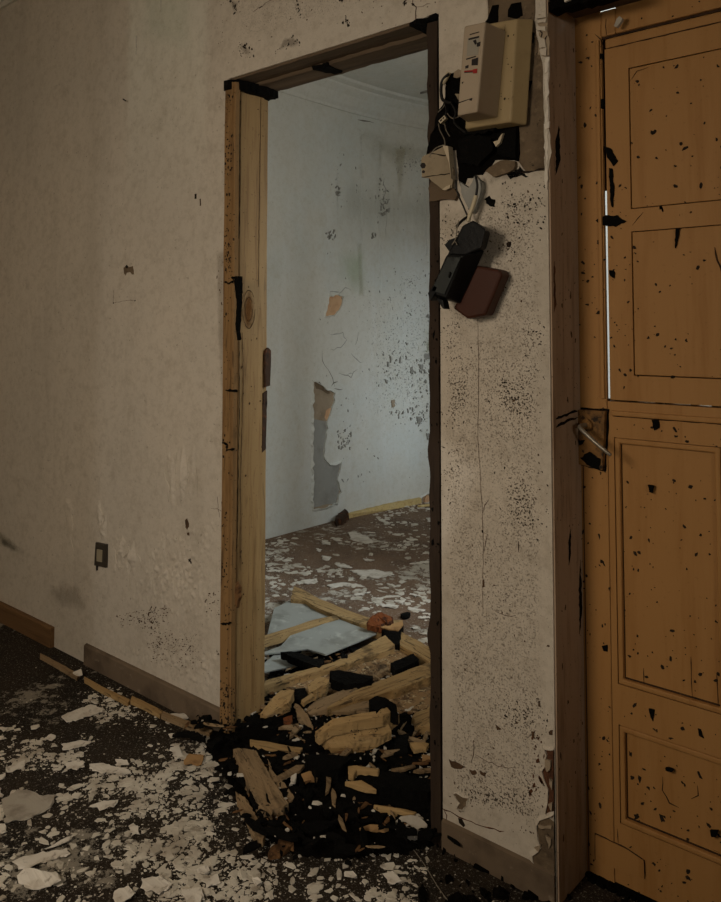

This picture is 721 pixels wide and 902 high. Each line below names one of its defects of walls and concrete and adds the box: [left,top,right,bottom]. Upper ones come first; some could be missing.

spalling [393,0,619,189]
spalling [320,277,350,320]
peeling [342,254,439,443]
spalling [310,375,370,512]